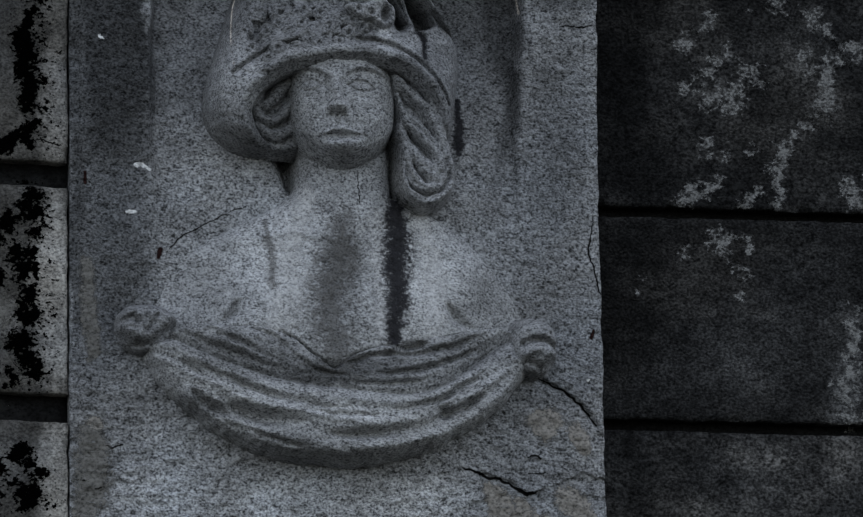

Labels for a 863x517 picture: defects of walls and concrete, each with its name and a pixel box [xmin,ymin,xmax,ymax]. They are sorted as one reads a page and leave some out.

damp [0,0,67,164]
damp [680,48,760,115]
damp [814,41,863,117]
damp [679,180,721,207]
damp [769,125,814,208]
damp [842,178,863,208]
crack [166,206,246,253]
damp [0,177,76,407]
damp [370,191,446,346]
crack [538,378,597,426]
crack [462,455,548,497]